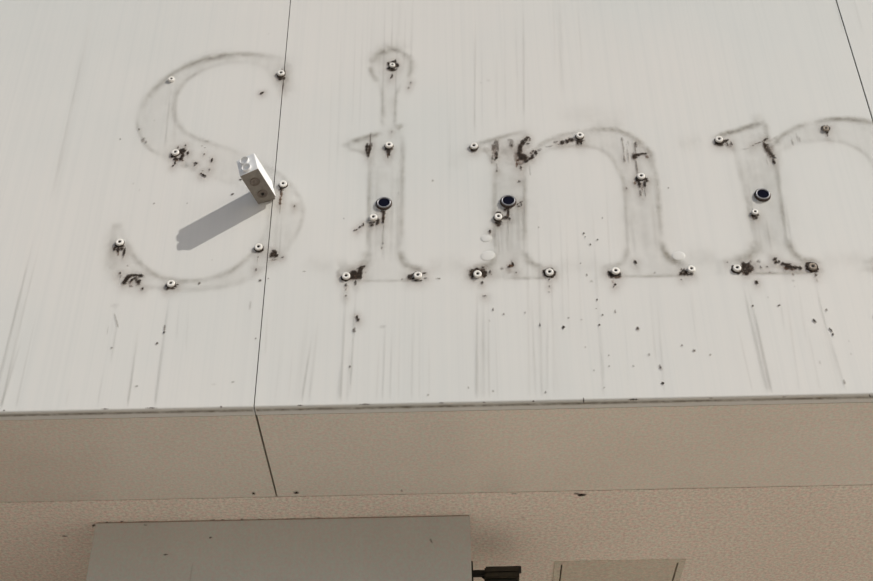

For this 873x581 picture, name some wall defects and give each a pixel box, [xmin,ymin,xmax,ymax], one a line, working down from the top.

rust [170,145,206,177]
rust [510,136,538,169]
rust [632,143,649,195]
rust [119,272,143,289]
rust [341,265,365,296]
rust [742,257,818,284]